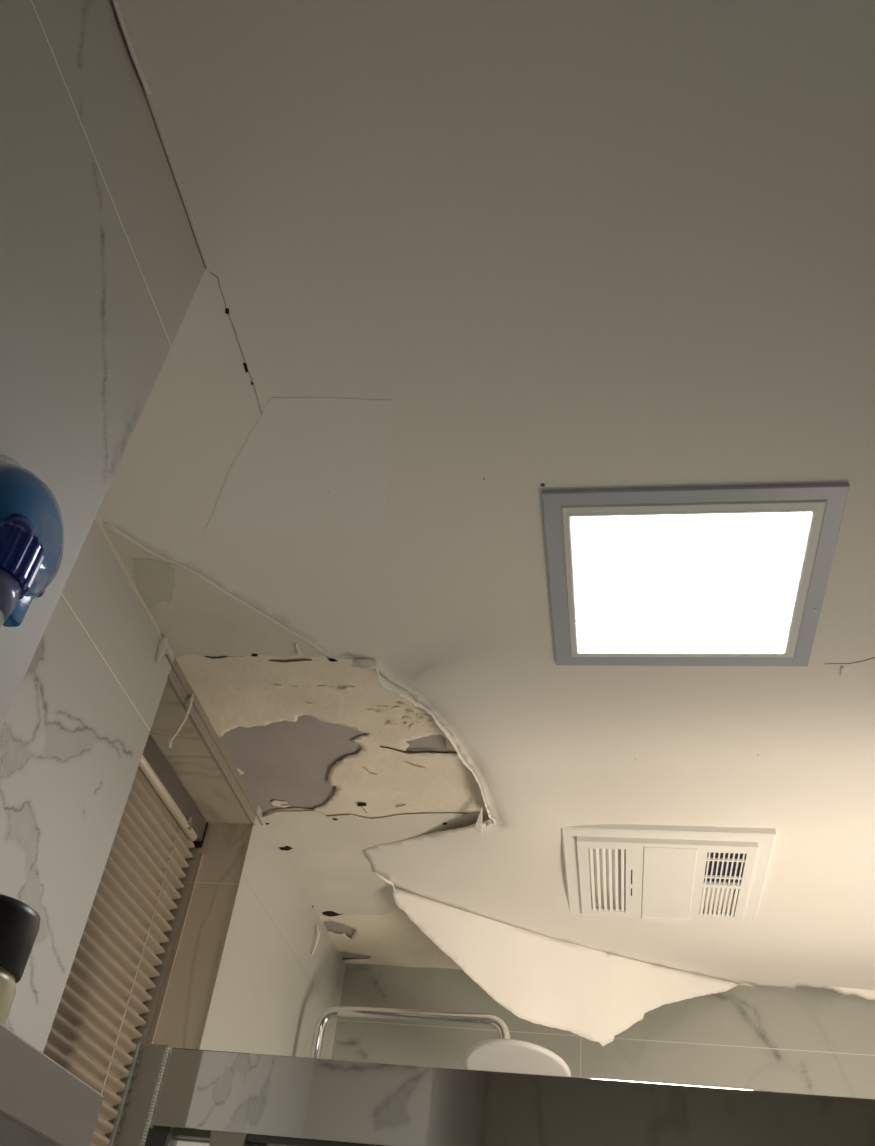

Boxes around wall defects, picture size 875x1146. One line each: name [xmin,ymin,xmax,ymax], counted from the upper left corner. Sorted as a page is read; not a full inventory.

peeling [112,0,210,269]
crack [210,271,262,415]
peeling [102,524,754,1046]
crack [827,657,875,678]